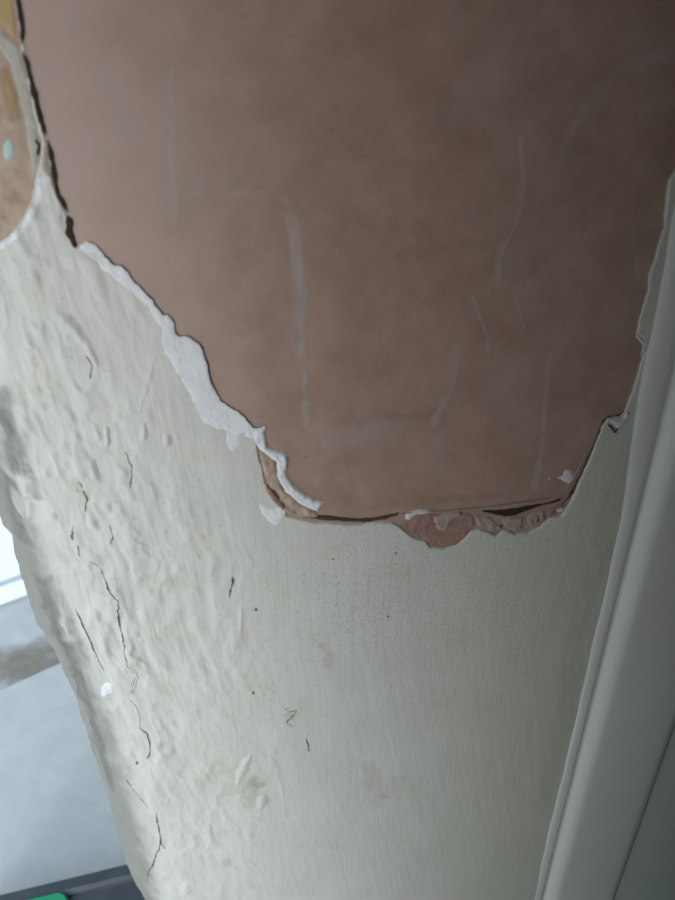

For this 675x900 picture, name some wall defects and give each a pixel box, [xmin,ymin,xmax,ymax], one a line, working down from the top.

peeling [0,0,675,548]
crack [70,482,151,758]
crack [119,780,166,882]